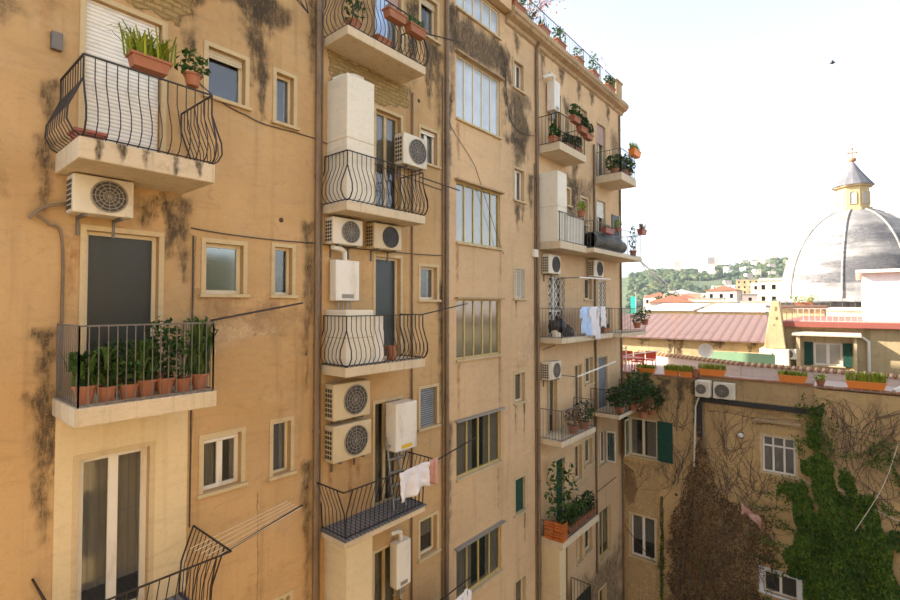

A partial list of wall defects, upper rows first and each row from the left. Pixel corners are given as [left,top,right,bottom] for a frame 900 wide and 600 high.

flaking render [127,0,192,27]
damp [236,0,289,113]
damp [302,223,313,333]